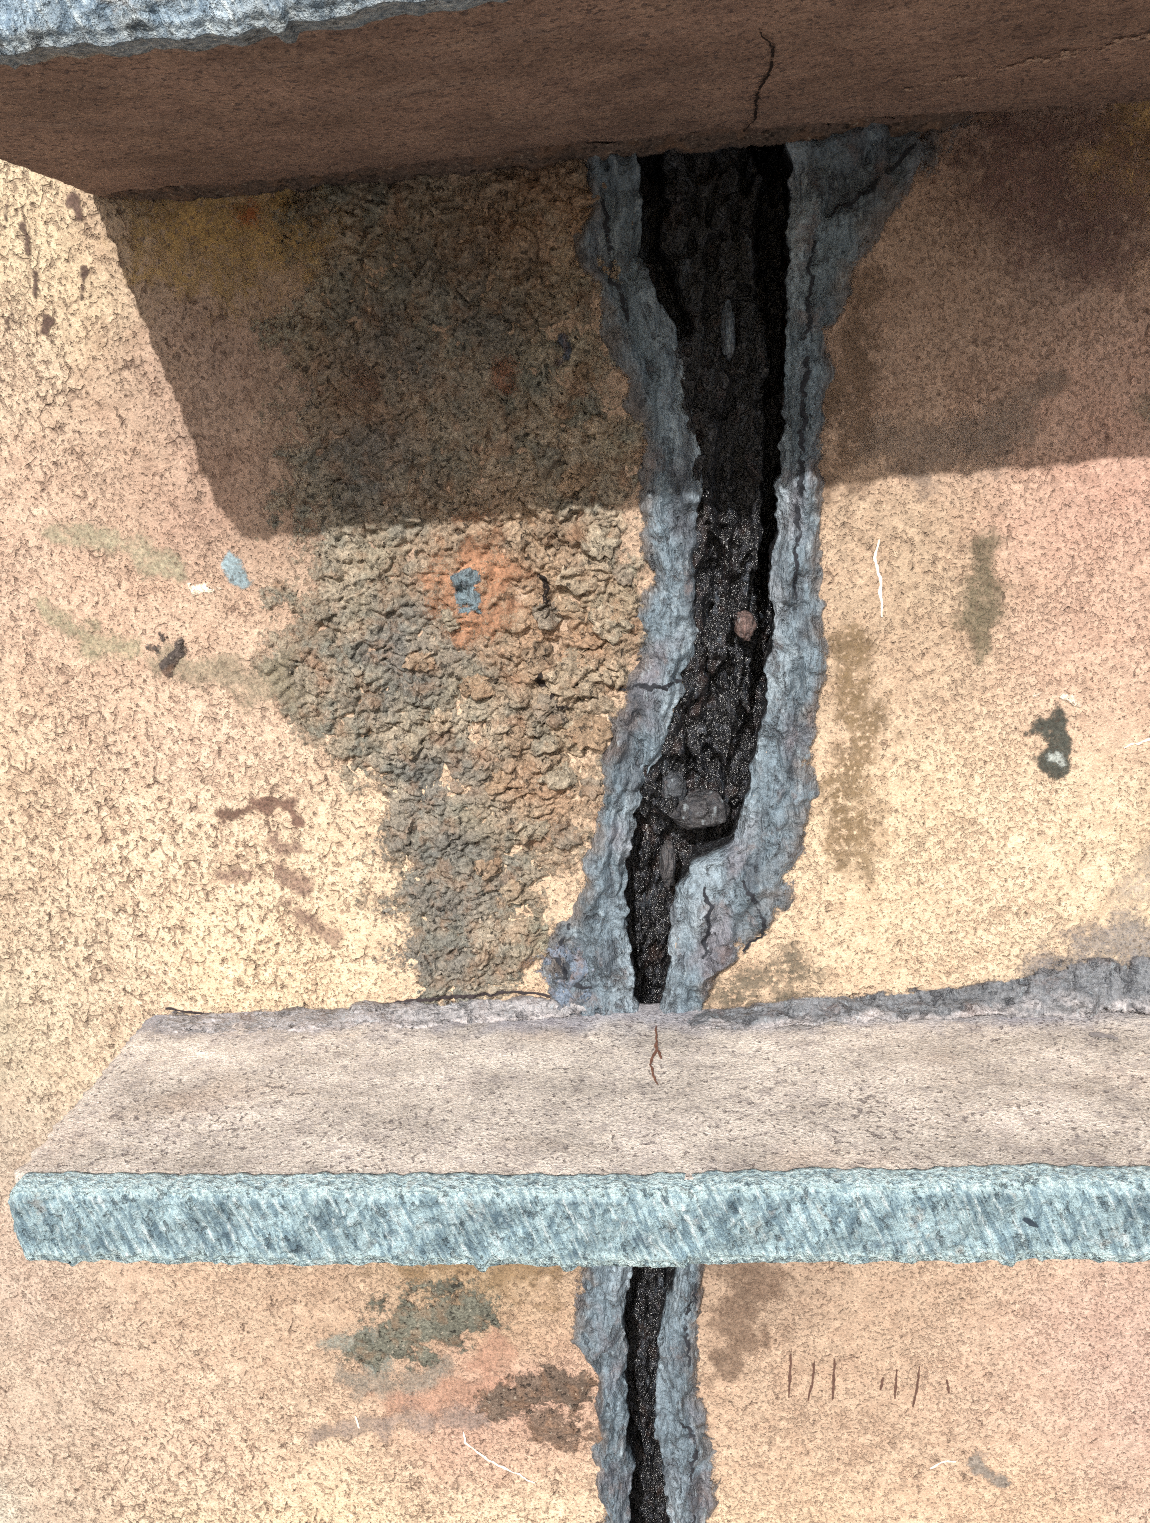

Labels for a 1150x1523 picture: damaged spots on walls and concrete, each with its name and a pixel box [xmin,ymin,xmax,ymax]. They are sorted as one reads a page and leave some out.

crack [383,32,977,1084]
crack [165,1007,225,1015]
crack [570,1264,722,1523]